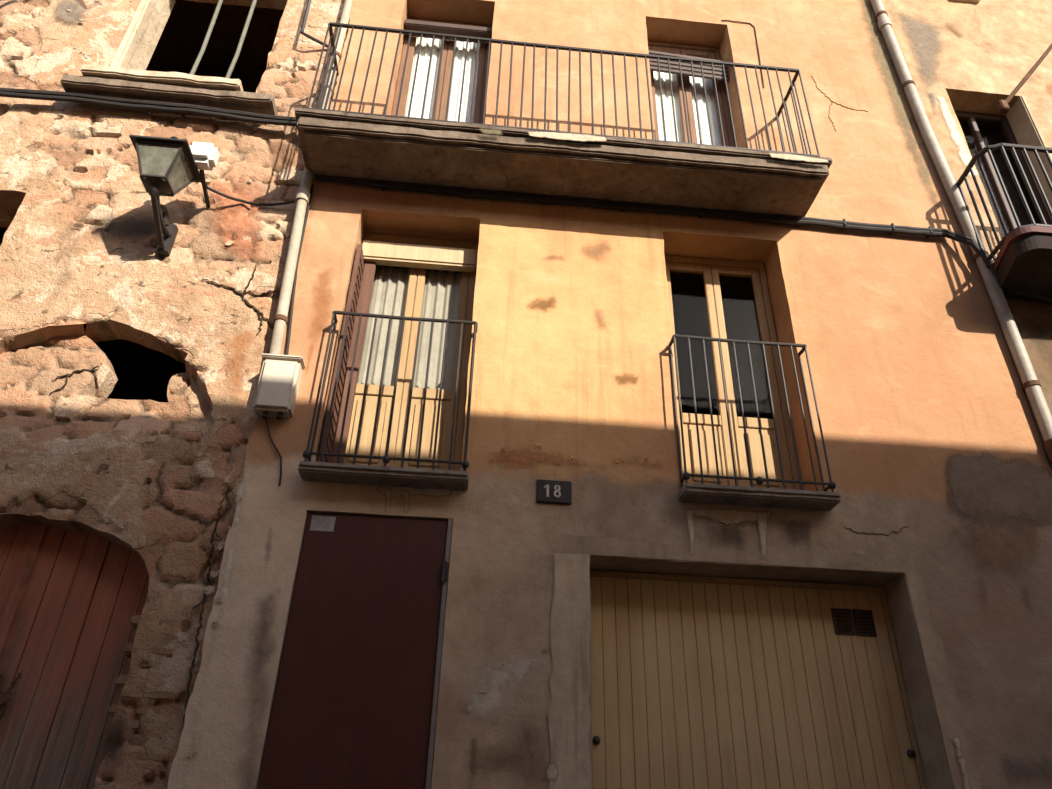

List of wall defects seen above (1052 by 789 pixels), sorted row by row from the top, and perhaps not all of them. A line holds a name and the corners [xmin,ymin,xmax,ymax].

crack [812,76,868,131]
leakage [863,1,939,195]
crack [201,266,280,336]
crack [845,526,909,536]